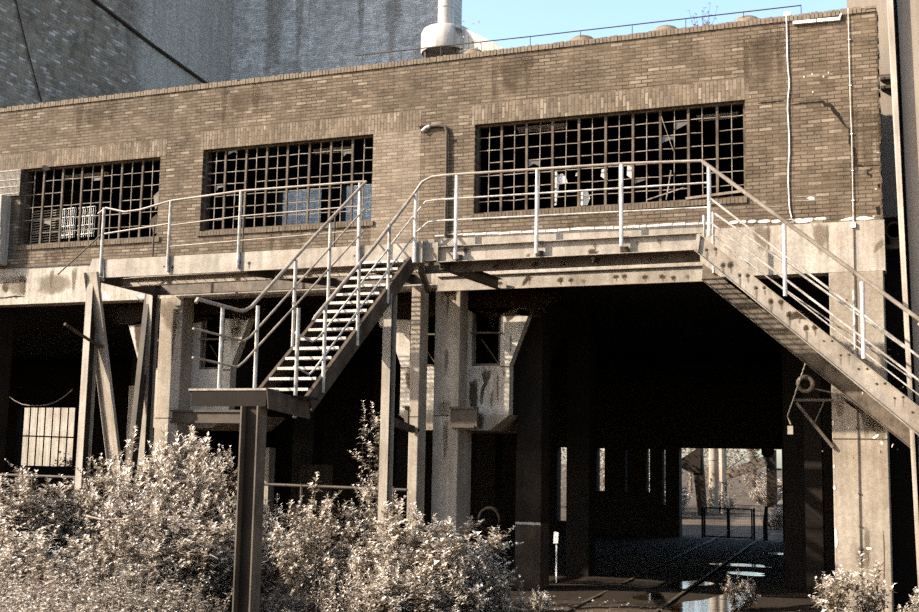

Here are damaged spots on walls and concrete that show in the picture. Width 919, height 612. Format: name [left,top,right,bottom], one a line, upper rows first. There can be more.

crack [758,100,878,177]